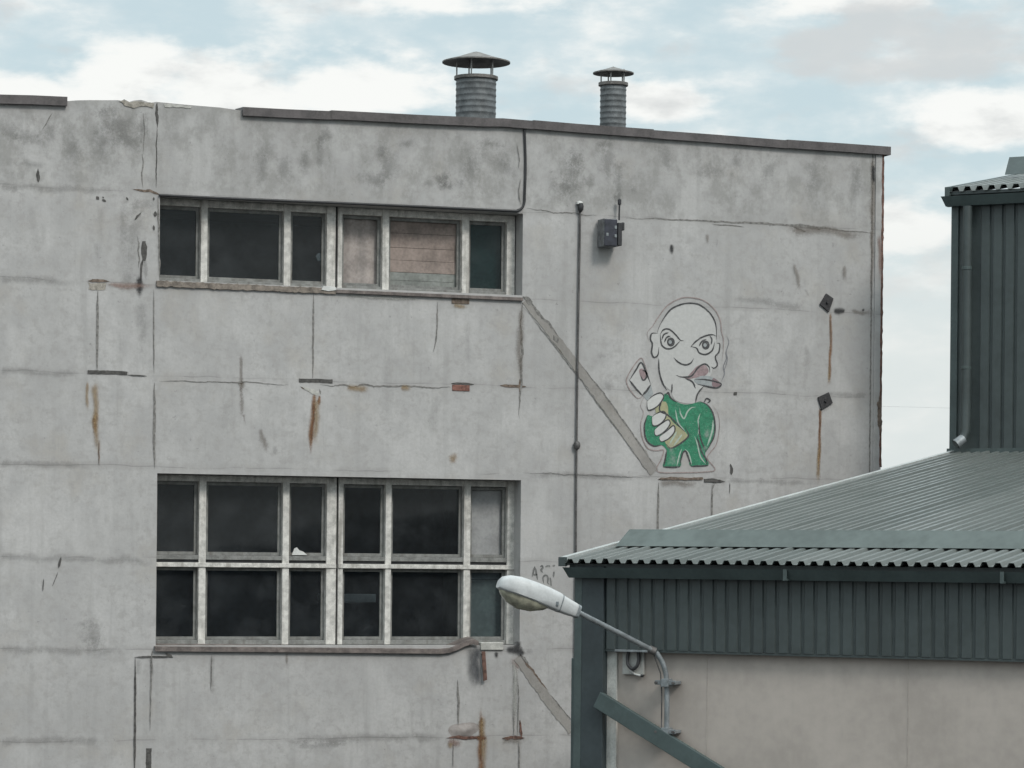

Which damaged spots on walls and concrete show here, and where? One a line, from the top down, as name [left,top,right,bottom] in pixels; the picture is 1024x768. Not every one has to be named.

rust [86,384,97,438]
rust [309,395,320,445]
rust [477,719,486,768]